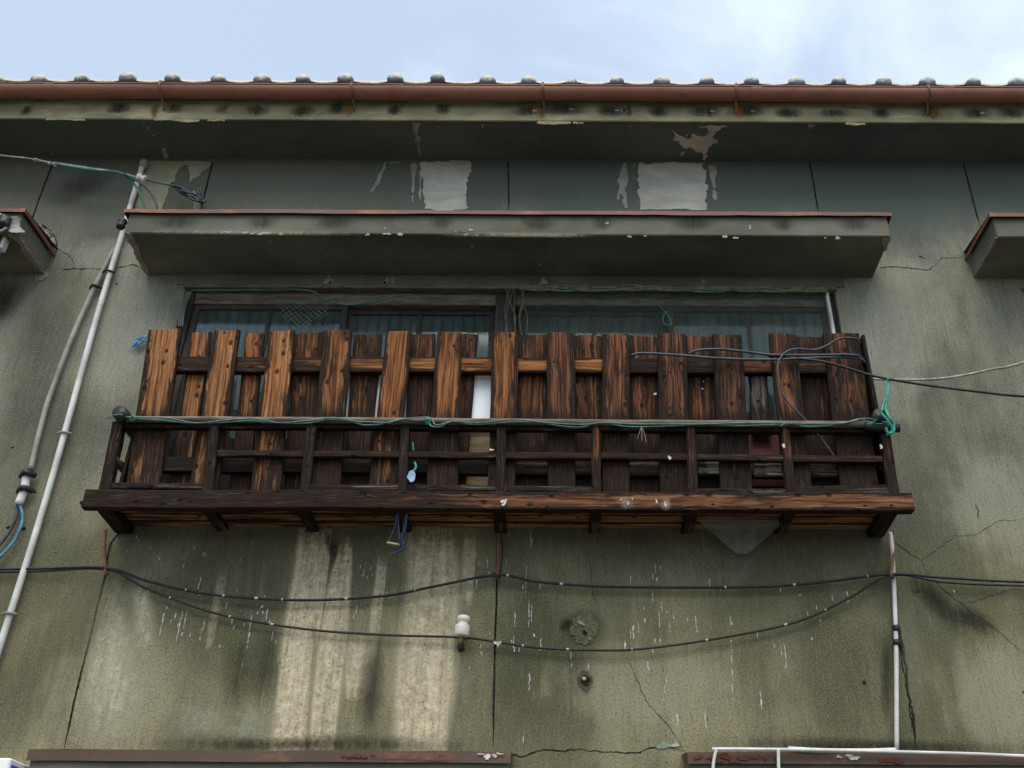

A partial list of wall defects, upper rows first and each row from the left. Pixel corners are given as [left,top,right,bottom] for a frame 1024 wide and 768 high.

peeling [135,148,211,209]
peeling [370,122,472,210]
peeling [617,125,727,211]
crack [881,256,961,270]
crack [64,534,119,747]
damp [138,527,490,751]
crack [492,580,686,758]
damp [624,564,674,670]
crack [897,612,917,750]
crack [892,504,1022,651]